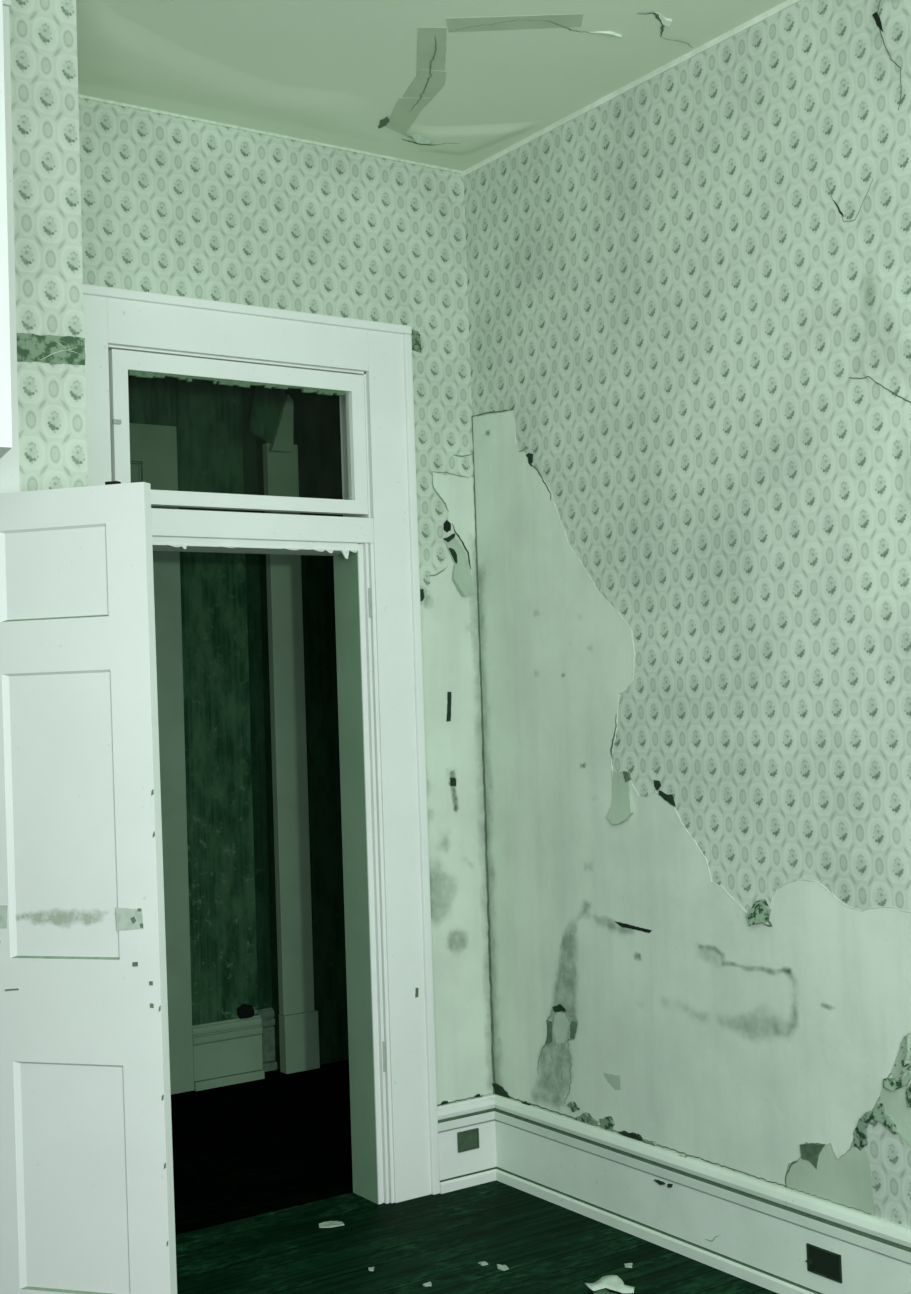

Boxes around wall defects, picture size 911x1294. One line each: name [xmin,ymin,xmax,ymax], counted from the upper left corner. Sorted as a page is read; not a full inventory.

crack [410,12,693,112]
peeling [607,771,634,825]
flaking render [614,921,652,933]
peeling [746,899,771,925]
leakage [537,1004,578,1103]
flaking render [603,1072,621,1090]
peeling [853,1033,911,1151]